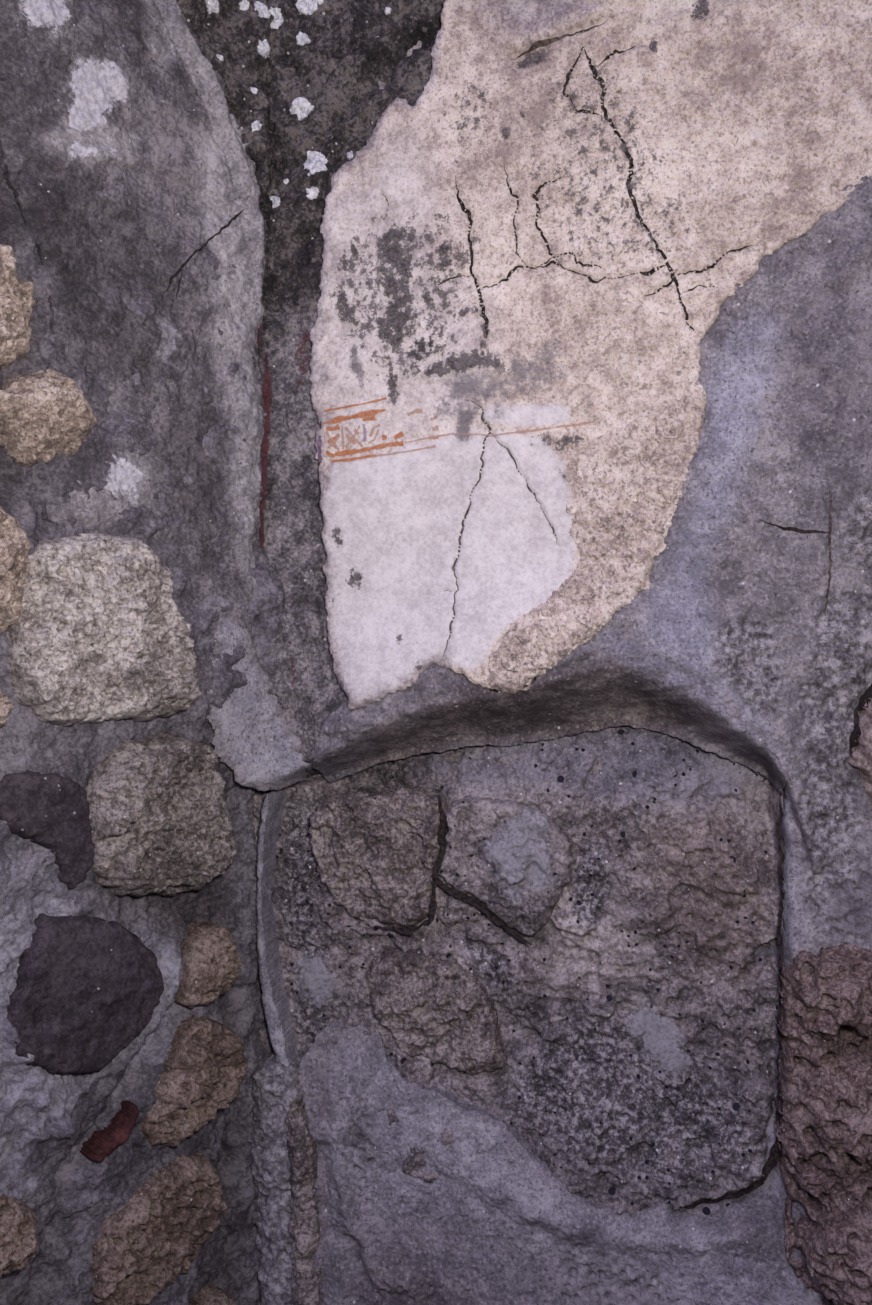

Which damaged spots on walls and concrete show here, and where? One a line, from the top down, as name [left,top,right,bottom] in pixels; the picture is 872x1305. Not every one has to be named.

crack [436,21,752,338]
crack [443,400,557,657]